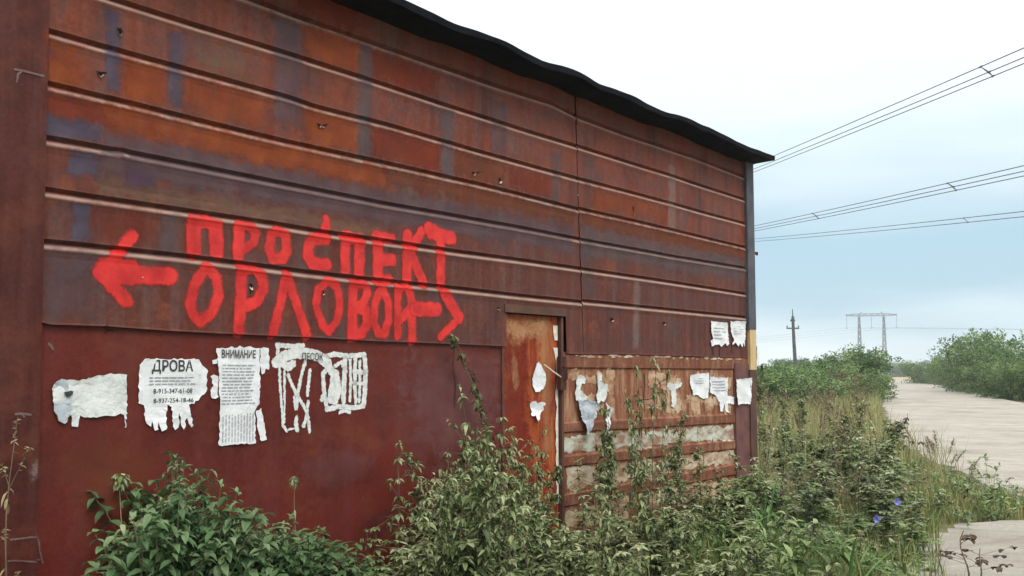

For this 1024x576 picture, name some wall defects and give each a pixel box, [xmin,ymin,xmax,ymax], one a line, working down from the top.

rust [46,36,744,257]
rust [504,318,545,473]
peeling [564,354,741,510]
peeling [565,496,629,528]